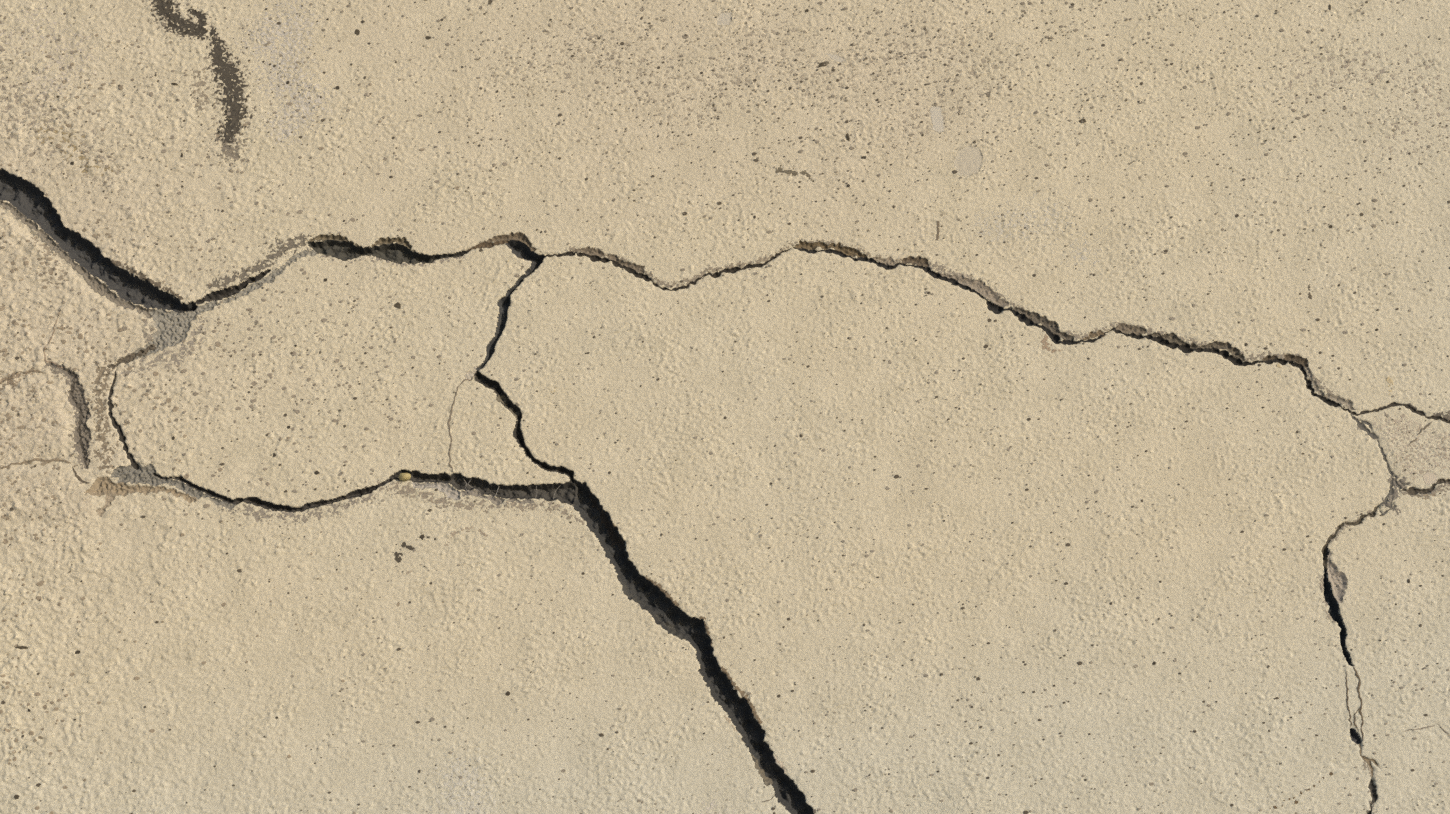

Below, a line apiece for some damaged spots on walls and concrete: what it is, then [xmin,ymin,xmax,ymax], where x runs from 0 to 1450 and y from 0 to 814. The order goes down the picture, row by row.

crack [0,168,271,313]
crack [0,239,1450,814]